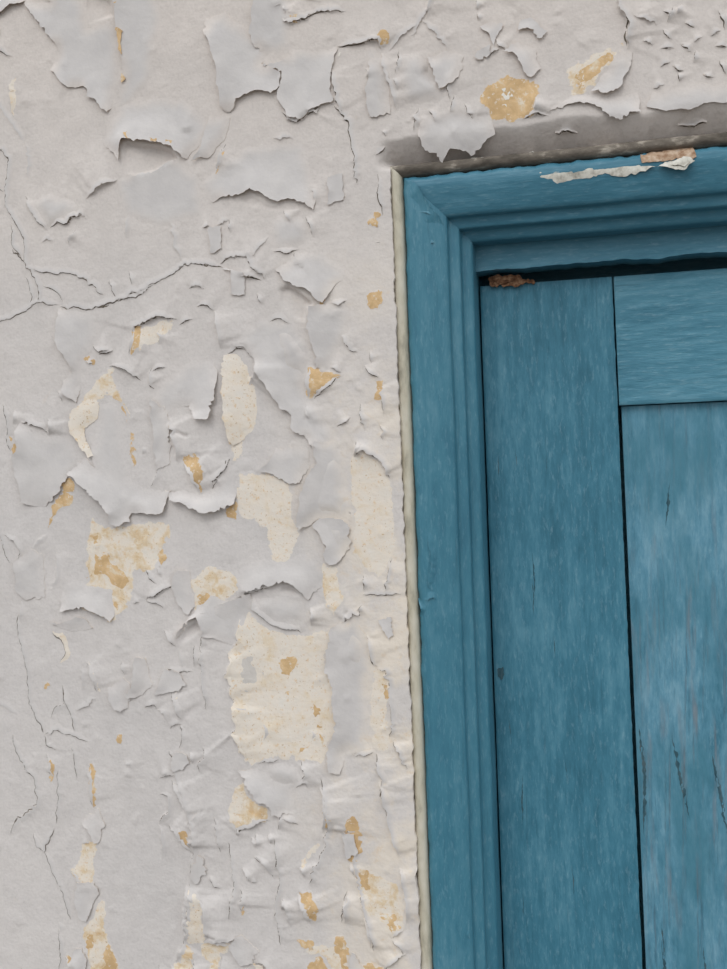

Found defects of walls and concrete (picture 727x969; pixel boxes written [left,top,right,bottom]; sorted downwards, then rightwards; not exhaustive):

peeling [475,18,547,77]
peeling [524,0,727,127]
peeling [555,123,578,135]
peeling [540,147,696,184]
peeling [0,0,495,969]
crack [0,614,89,969]